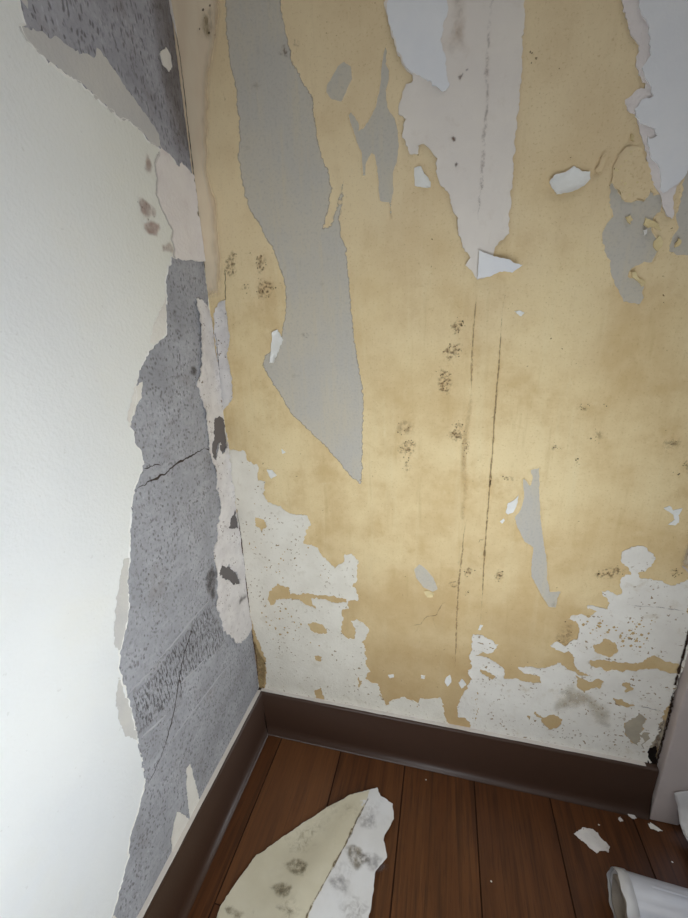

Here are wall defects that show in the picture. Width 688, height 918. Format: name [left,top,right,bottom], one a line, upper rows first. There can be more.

flaking render [17,0,192,173]
peeling [225,0,364,484]
peeling [347,45,401,219]
peeling [414,166,431,188]
peeling [600,171,688,308]
crack [138,448,211,488]
flaking render [111,256,259,918]
peeling [413,563,439,598]
peeling [500,466,562,608]
peeling [664,506,682,525]
leakage [652,631,688,765]